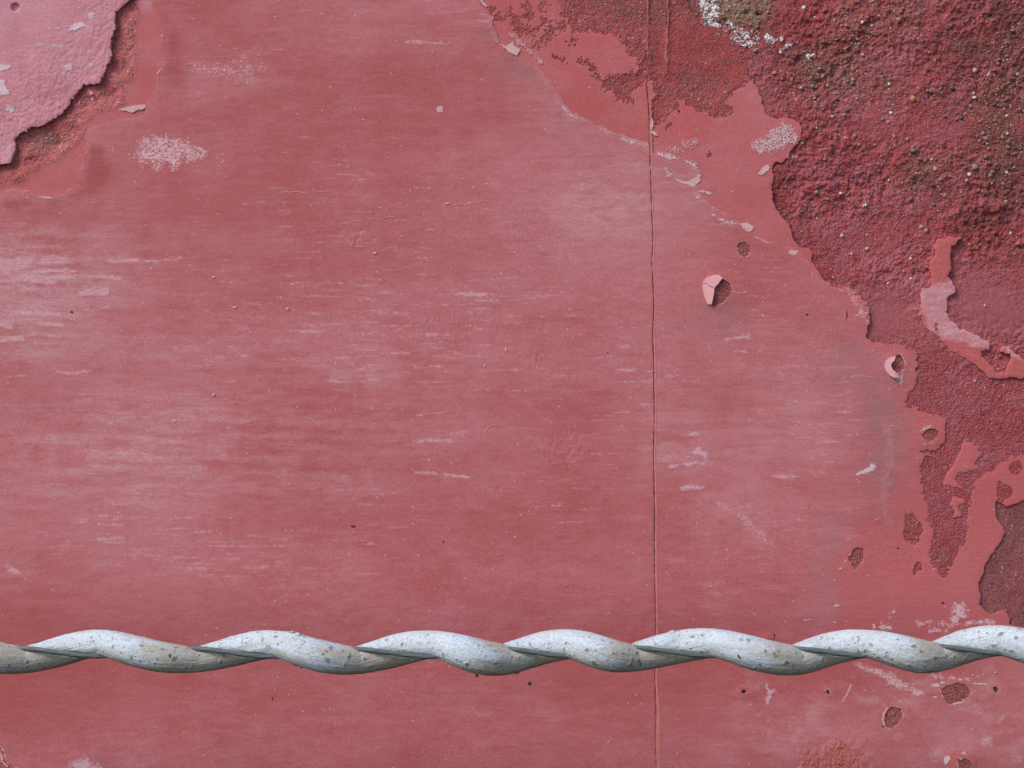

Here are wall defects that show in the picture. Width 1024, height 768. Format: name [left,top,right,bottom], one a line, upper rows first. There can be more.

flaking render [0,0,163,199]
crack [645,0,670,635]
flaking render [480,0,1024,628]
crack [653,668,661,768]
peeling [882,706,904,730]
peeling [931,681,970,705]